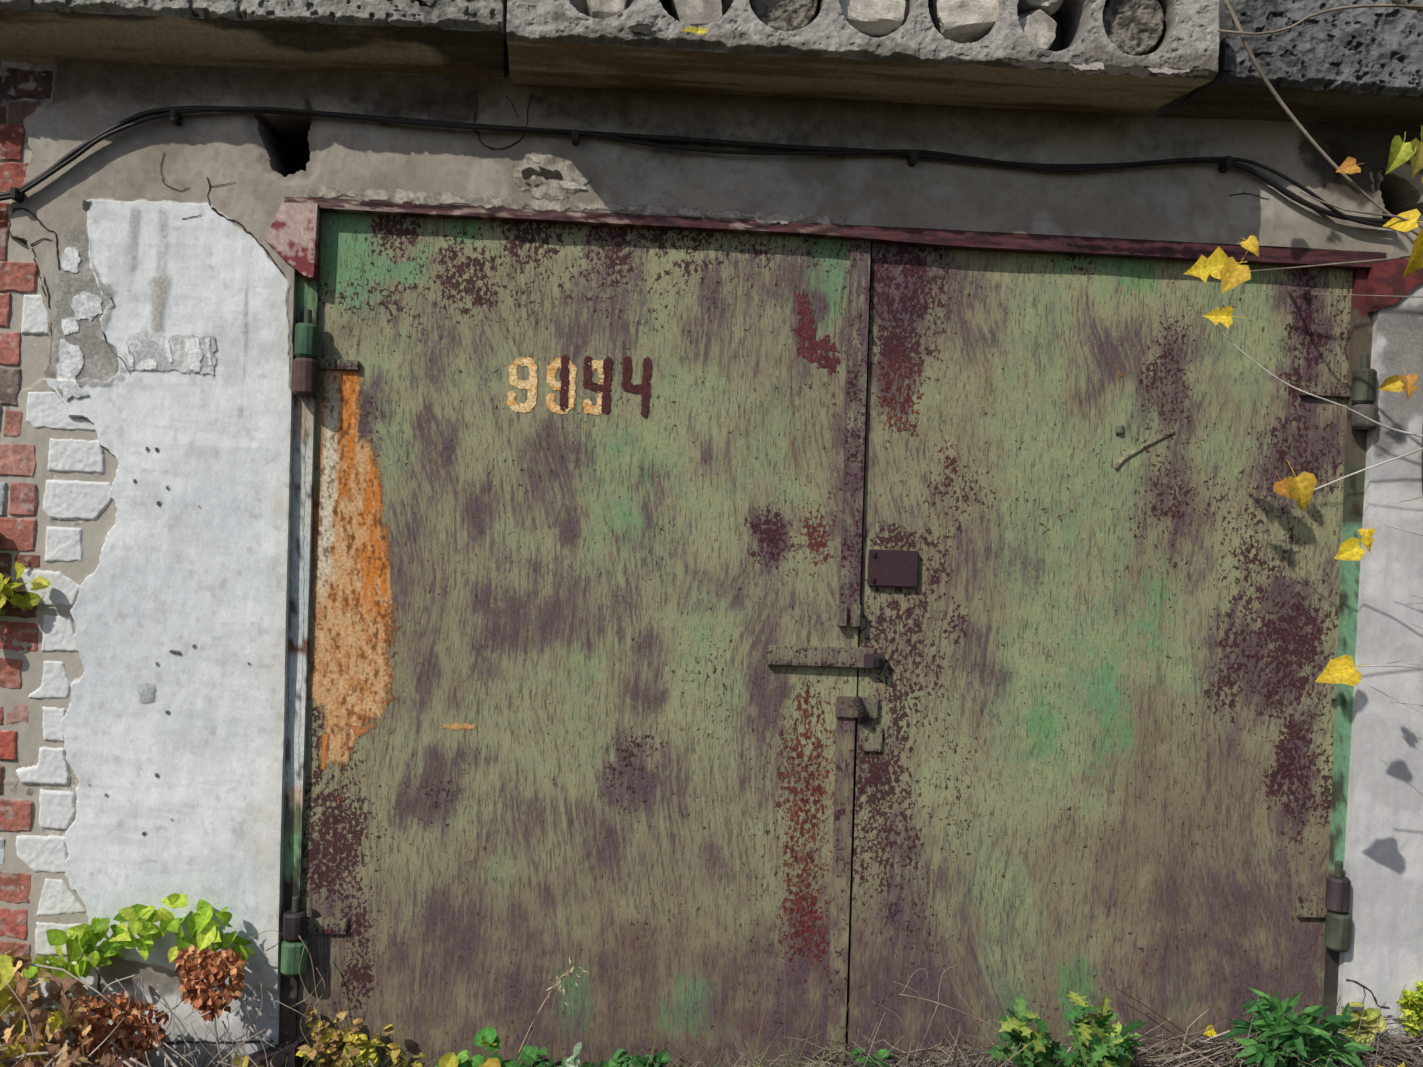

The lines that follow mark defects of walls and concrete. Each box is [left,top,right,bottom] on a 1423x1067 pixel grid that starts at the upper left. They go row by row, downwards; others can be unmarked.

spalling [307,151,846,226]
rust [790,288,840,416]
rust [877,360,912,432]
spalling [16,227,216,1067]
rust [310,364,400,804]
rust [770,679,829,963]